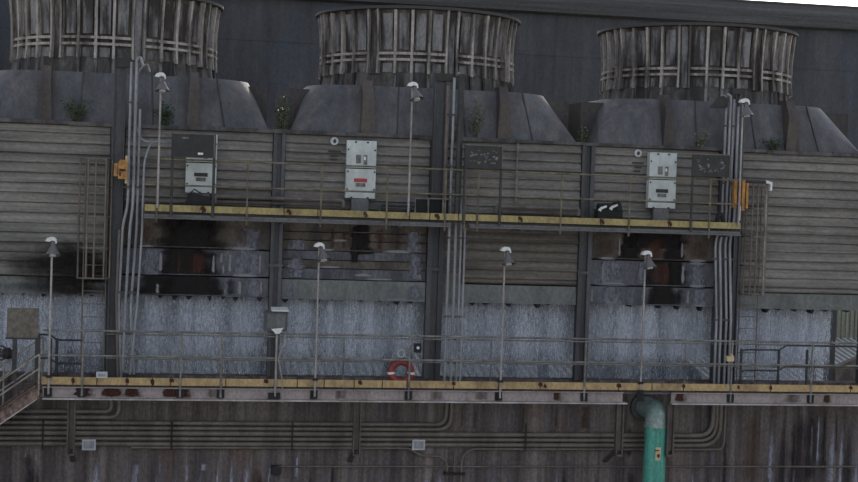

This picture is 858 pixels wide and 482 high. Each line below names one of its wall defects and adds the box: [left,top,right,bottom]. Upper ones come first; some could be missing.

damp [134,219,232,296]
damp [618,233,686,306]
corrosion [102,388,139,397]
corrosion [162,389,190,397]
damp [768,421,857,482]